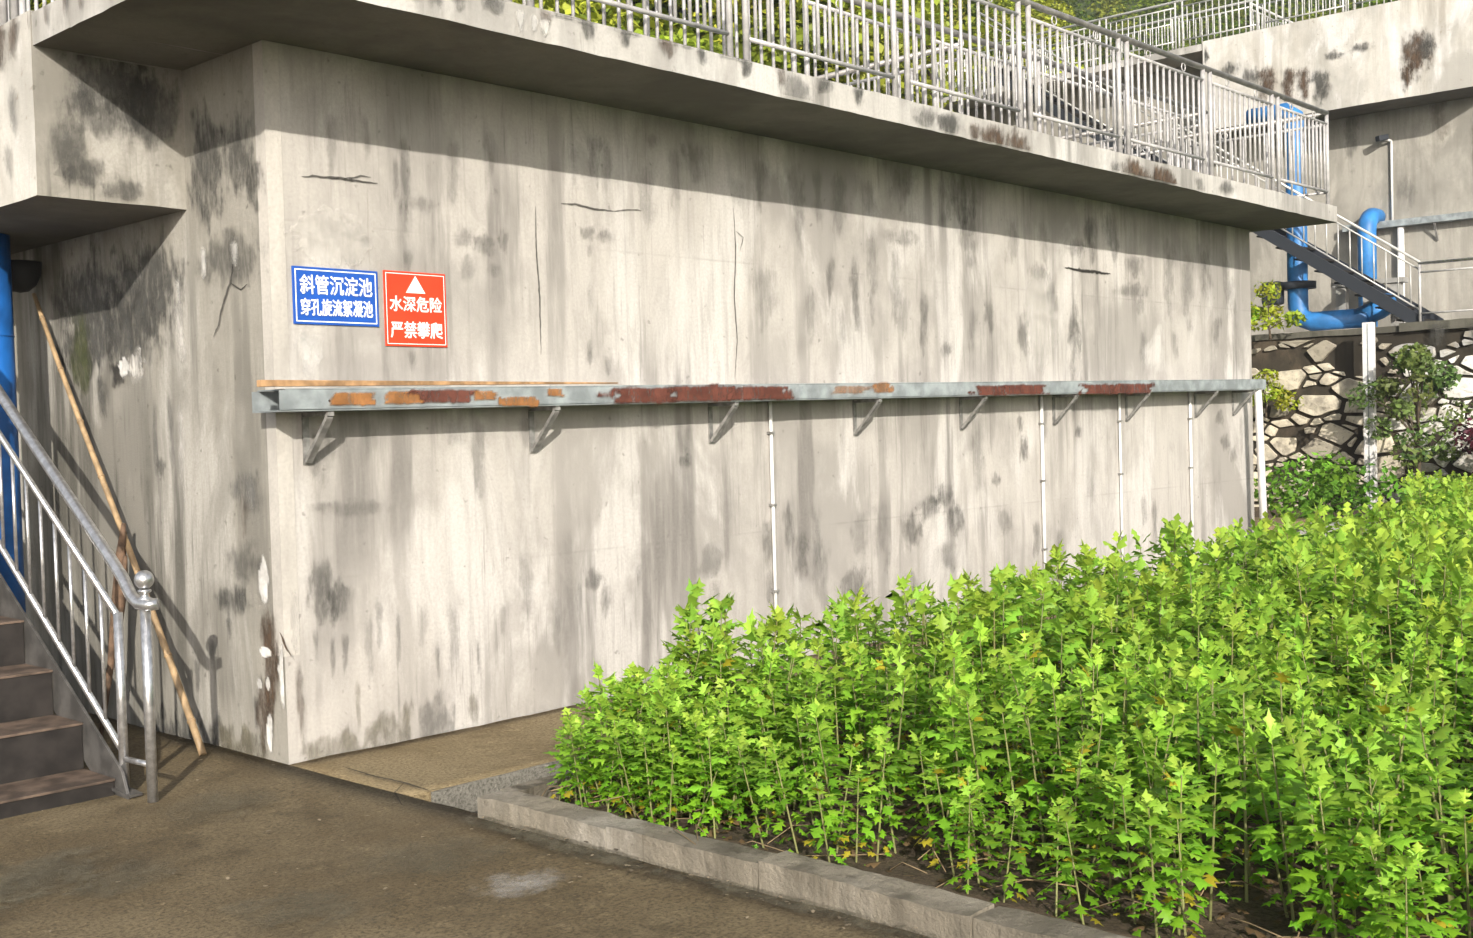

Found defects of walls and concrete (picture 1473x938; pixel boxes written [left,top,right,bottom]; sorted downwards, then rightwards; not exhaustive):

leakage [53,55,258,230]
crack [302,175,377,184]
crack [535,203,640,342]
crack [1065,267,1110,275]
leakage [51,247,183,411]
rust [331,388,564,407]
rust [598,383,795,404]
rust [968,384,1048,395]
rust [1078,383,1155,395]